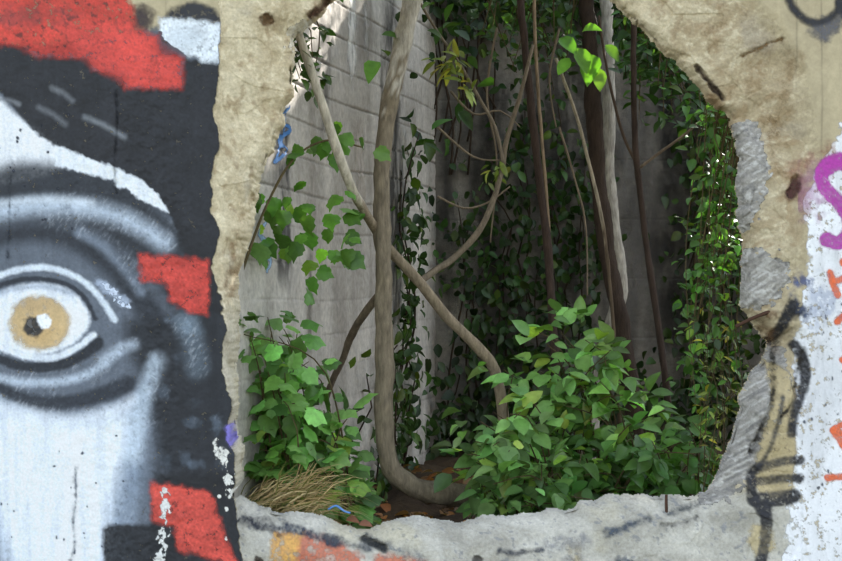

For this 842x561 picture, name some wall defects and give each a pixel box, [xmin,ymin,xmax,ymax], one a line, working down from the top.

peeling [153,487,171,561]
spalling [210,0,827,561]